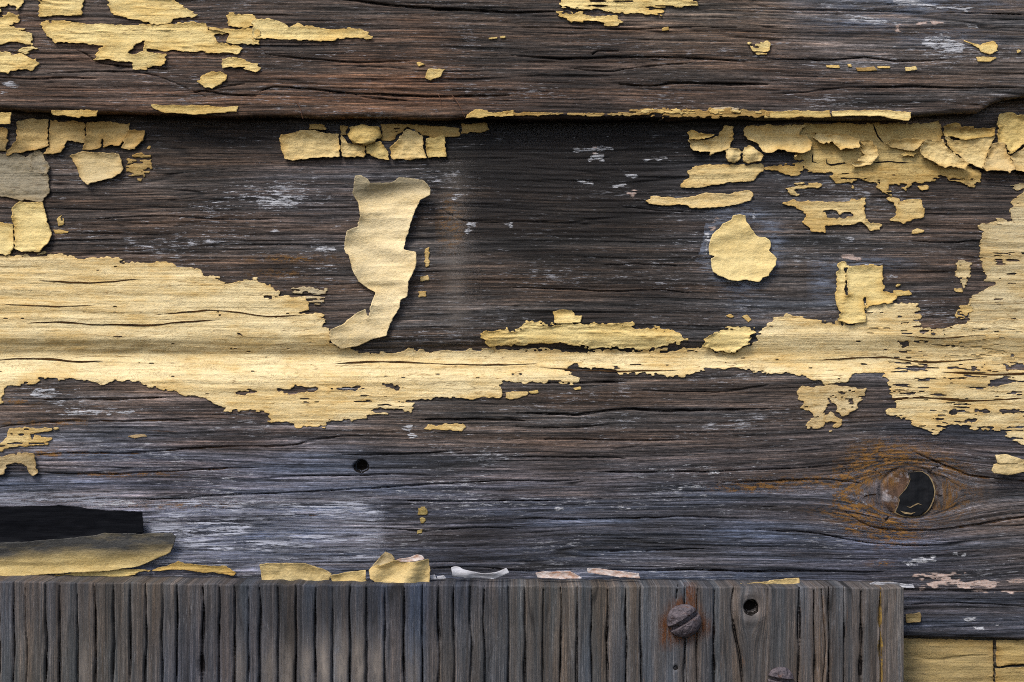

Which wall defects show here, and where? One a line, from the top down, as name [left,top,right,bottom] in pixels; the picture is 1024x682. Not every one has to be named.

peeling [0,0,373,94]
peeling [556,0,698,31]
peeling [0,107,1024,445]
peeling [0,500,236,576]